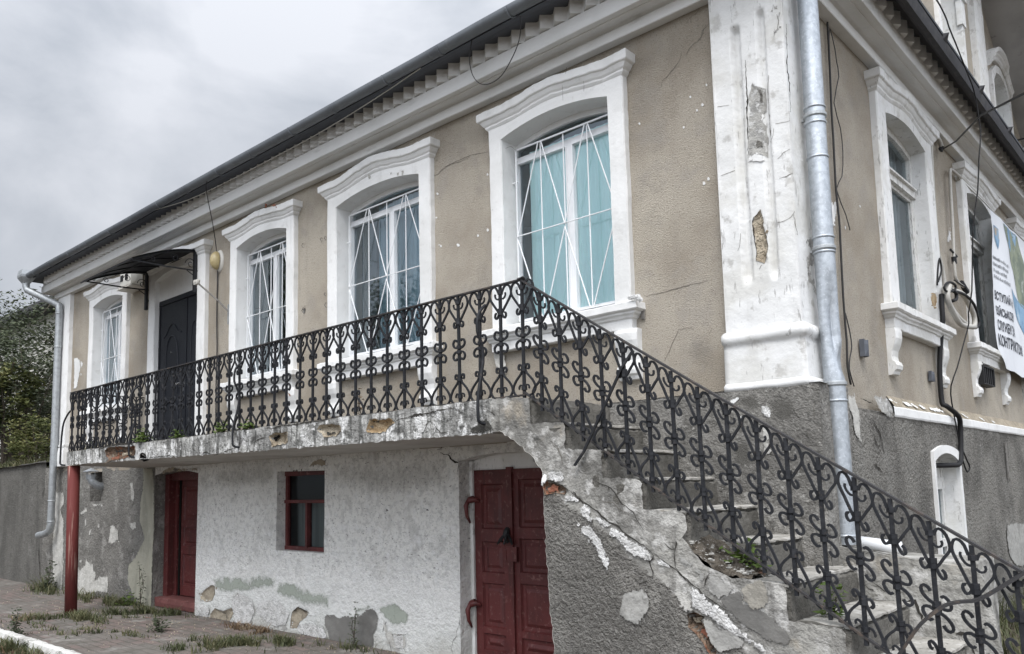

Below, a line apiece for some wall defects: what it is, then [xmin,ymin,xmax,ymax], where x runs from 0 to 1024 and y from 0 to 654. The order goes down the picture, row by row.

flaking render [748,82,768,162]
flaking render [752,210,769,263]
spalling [105,446,136,464]
spalling [269,432,288,447]
spalling [301,424,342,447]
spalling [366,418,395,433]
peeling [78,560,108,594]
peeling [81,504,119,544]
crack [564,479,724,609]
peeling [541,471,766,654]
peeling [199,585,326,638]